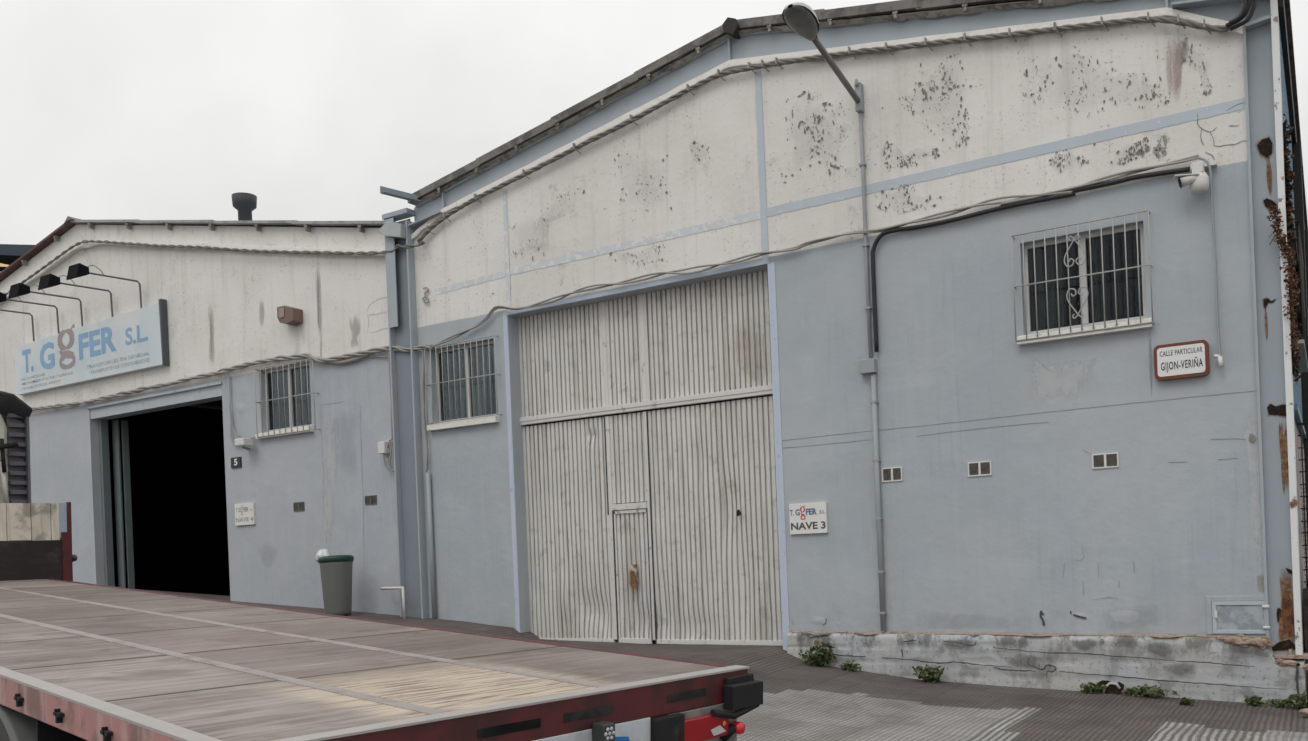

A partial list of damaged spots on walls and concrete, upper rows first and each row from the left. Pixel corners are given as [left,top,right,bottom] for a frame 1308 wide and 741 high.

corrosion [1257,142,1272,194]
corrosion [1272,568,1295,651]
spalling [1215,634,1308,673]